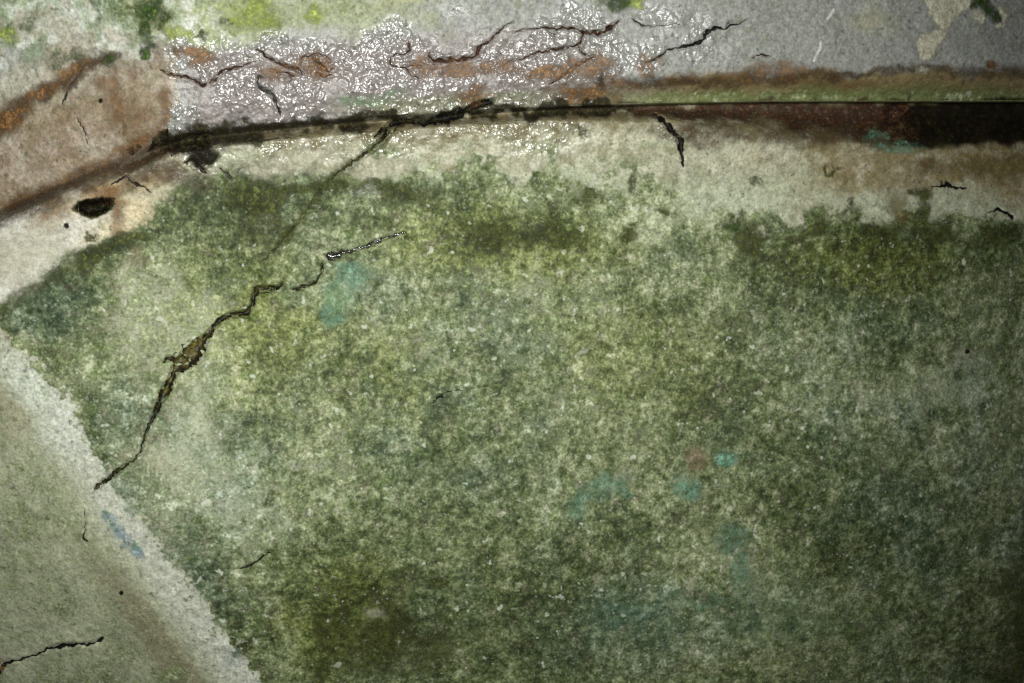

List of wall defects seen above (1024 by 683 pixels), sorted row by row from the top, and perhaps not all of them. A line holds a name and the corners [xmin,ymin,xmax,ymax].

corrosion [0,64,82,129]
leakage [12,51,122,113]
corrosion [175,46,215,67]
crack [160,49,333,116]
crack [389,18,745,85]
corrosion [530,55,626,105]
spalling [72,197,115,219]
leakage [224,145,348,242]
leakage [0,97,1024,226]
crack [653,113,684,167]
crack [82,98,493,542]
leakage [103,511,145,559]